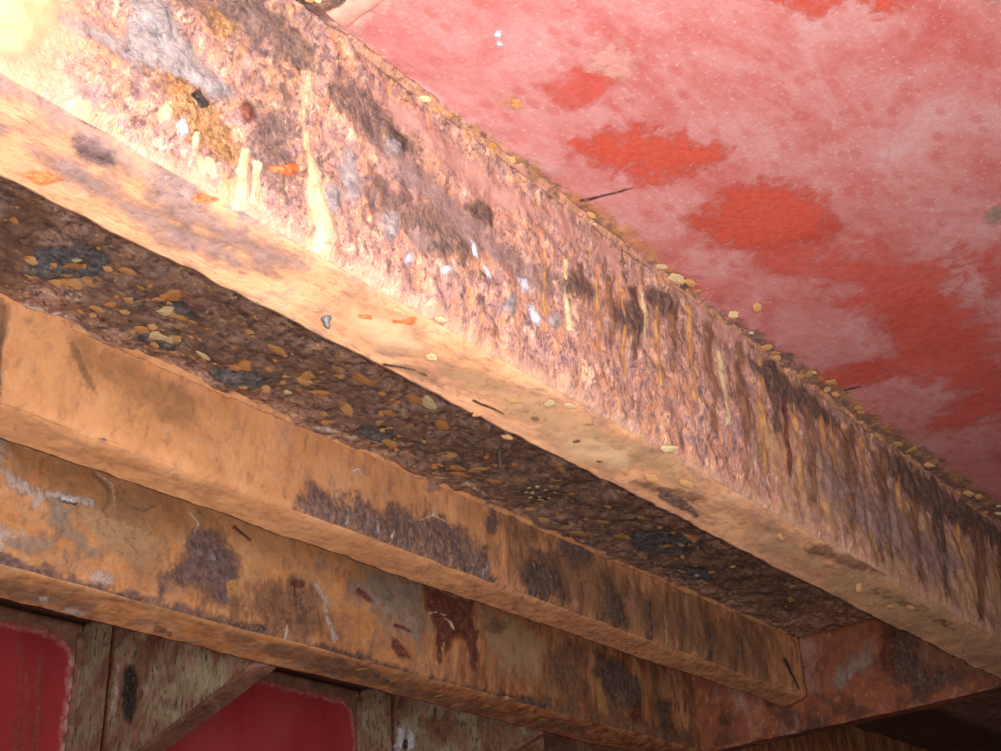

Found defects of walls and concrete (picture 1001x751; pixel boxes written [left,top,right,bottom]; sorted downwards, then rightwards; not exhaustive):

rust [296,0,346,12]
rust [22,93,304,275]
rust [404,88,498,149]
rust [508,156,639,254]
rust [20,239,611,603]
rust [345,303,706,517]
rust [562,257,1001,691]
rust [0,529,479,682]